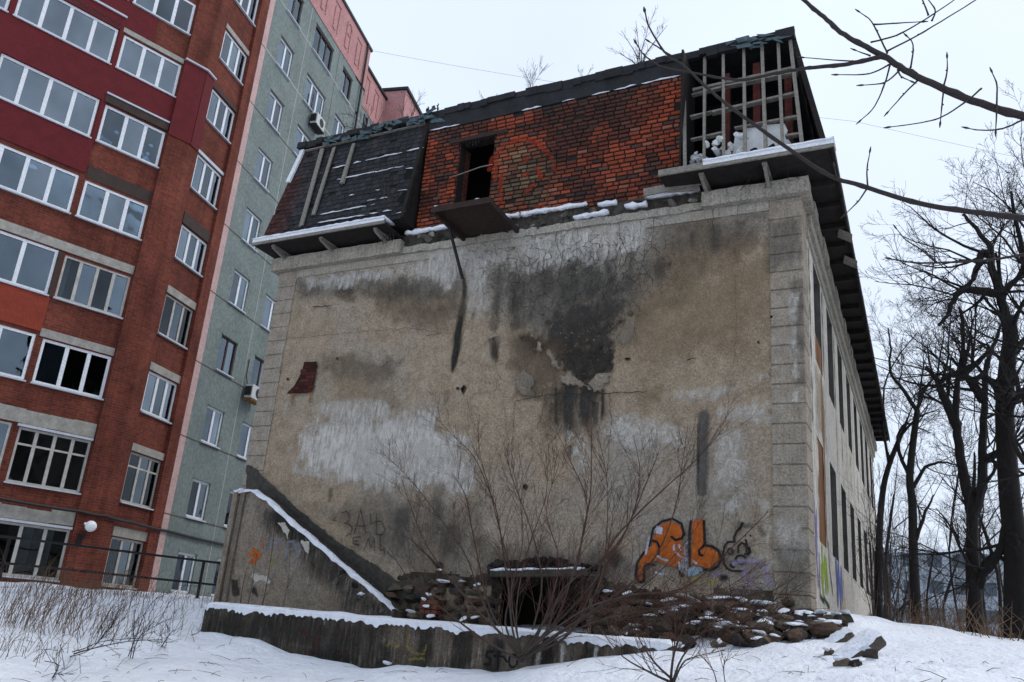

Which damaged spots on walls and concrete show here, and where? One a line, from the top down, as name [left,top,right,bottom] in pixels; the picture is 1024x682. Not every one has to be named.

spalling [287,361,317,394]
leakage [307,270,400,305]
leakage [406,243,505,372]
crack [463,209,686,475]
leakage [508,223,644,466]
efflorescence [609,417,684,449]